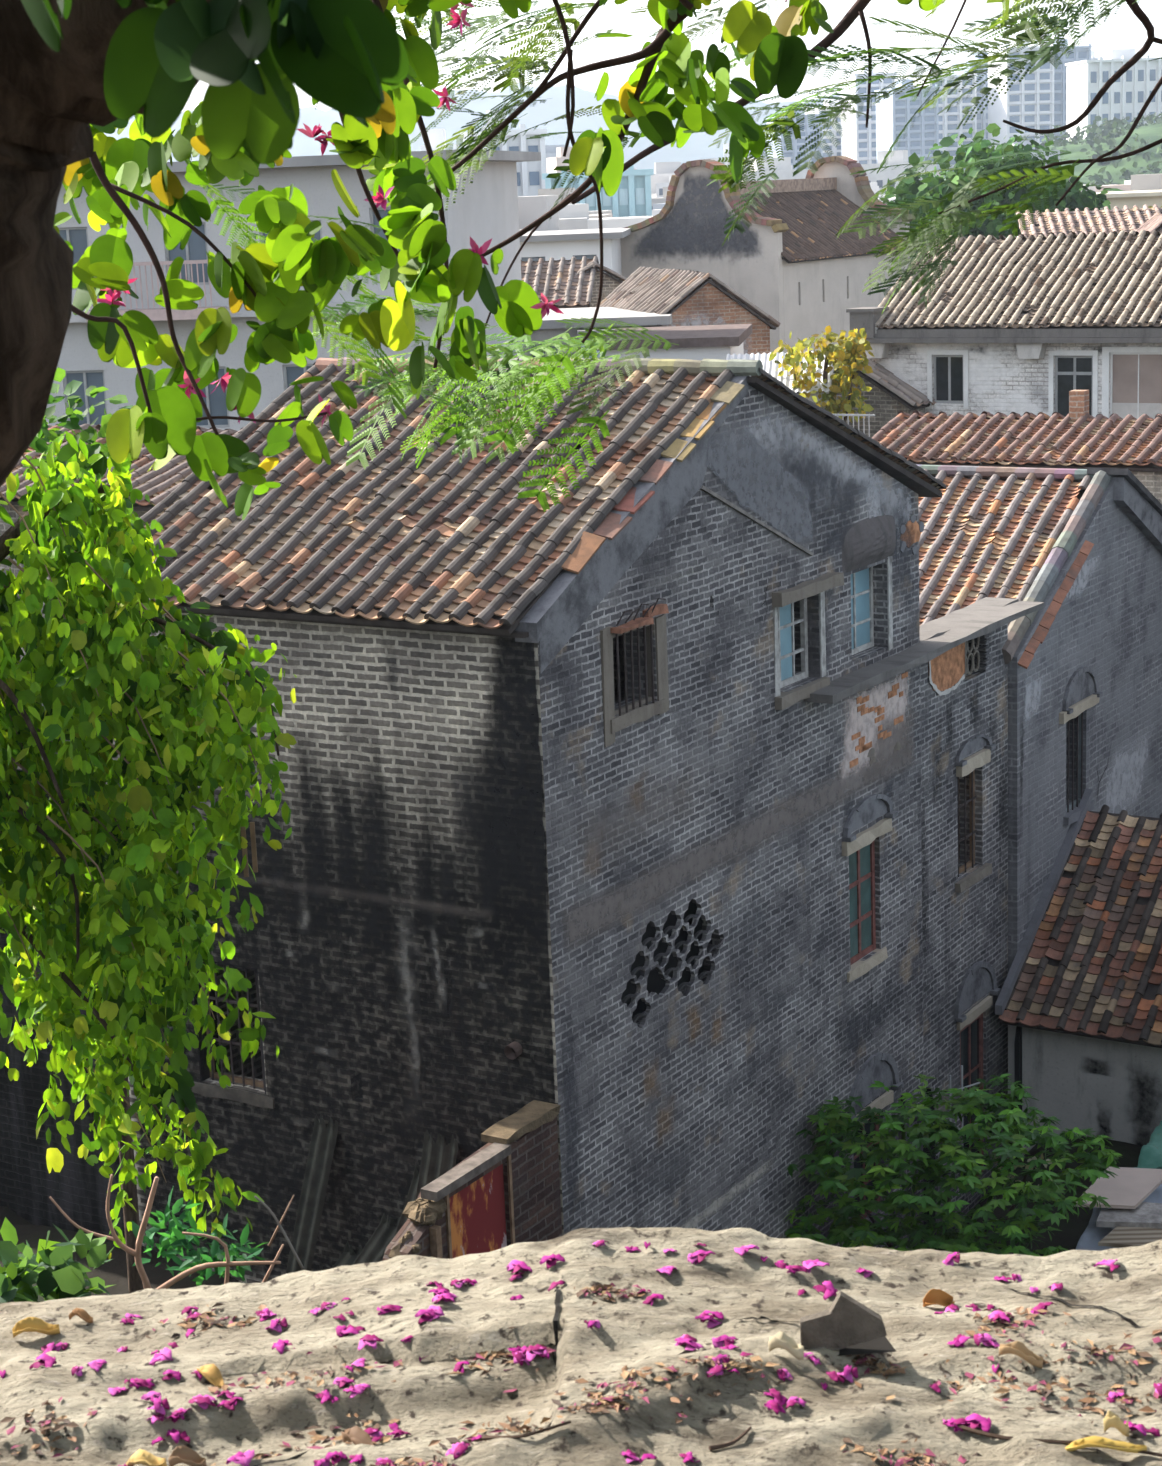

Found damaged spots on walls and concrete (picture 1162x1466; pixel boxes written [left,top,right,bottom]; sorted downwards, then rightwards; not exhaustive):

spalling [928,642,966,696]
flaking render [843,672,908,778]
water stain [134,636,913,1278]